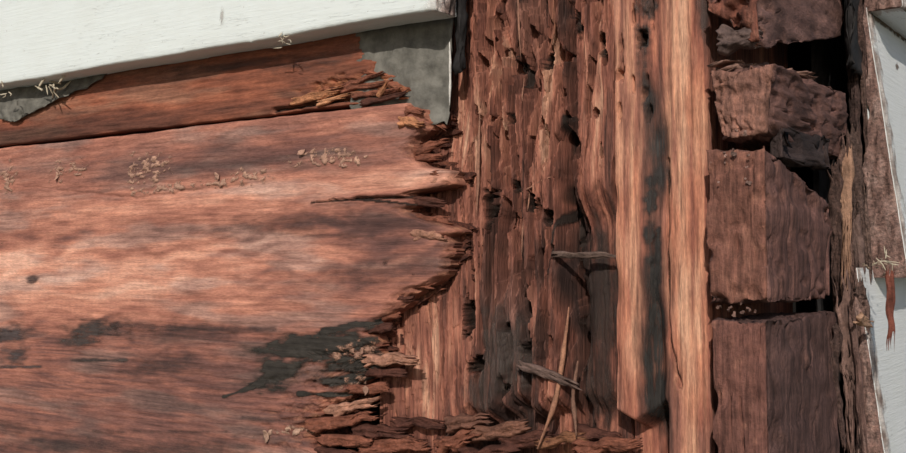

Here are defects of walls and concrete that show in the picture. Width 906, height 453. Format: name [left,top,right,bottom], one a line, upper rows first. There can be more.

spalling [787,41,811,72]
peeling [411,123,451,176]
crack [311,196,418,206]
spalling [791,167,813,190]
peeling [826,0,906,453]
spalling [793,298,816,313]
damp [222,318,391,398]
peeling [314,367,643,453]